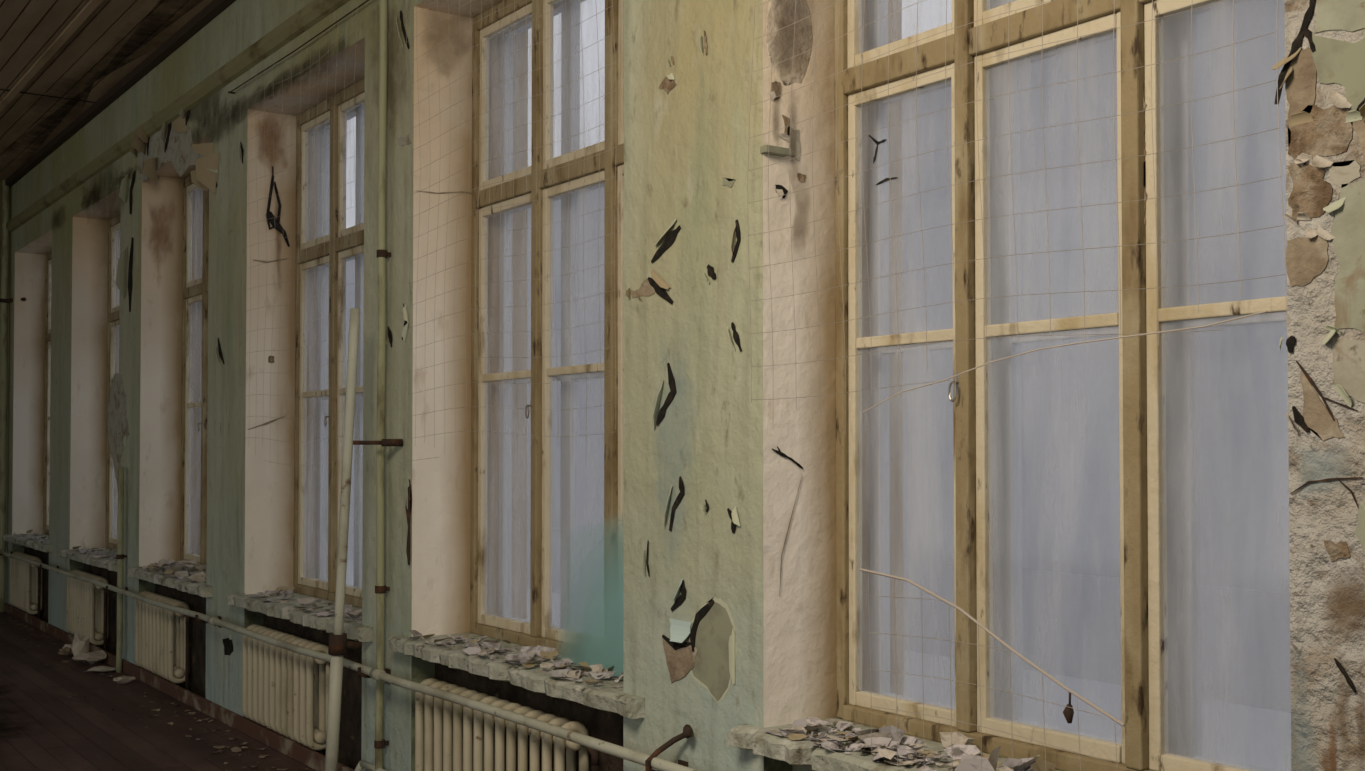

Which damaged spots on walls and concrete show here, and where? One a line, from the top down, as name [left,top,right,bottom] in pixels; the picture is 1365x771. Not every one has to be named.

peeling [119,108,220,214]
flaking render [1271,0,1365,287]
peeling [625,218,681,304]
peeling [703,264,716,284]
peeling [731,219,740,263]
peeling [727,322,742,352]
peeling [653,363,676,427]
flaking render [1279,335,1344,441]
peeling [1324,540,1351,562]
flaking render [662,579,737,703]